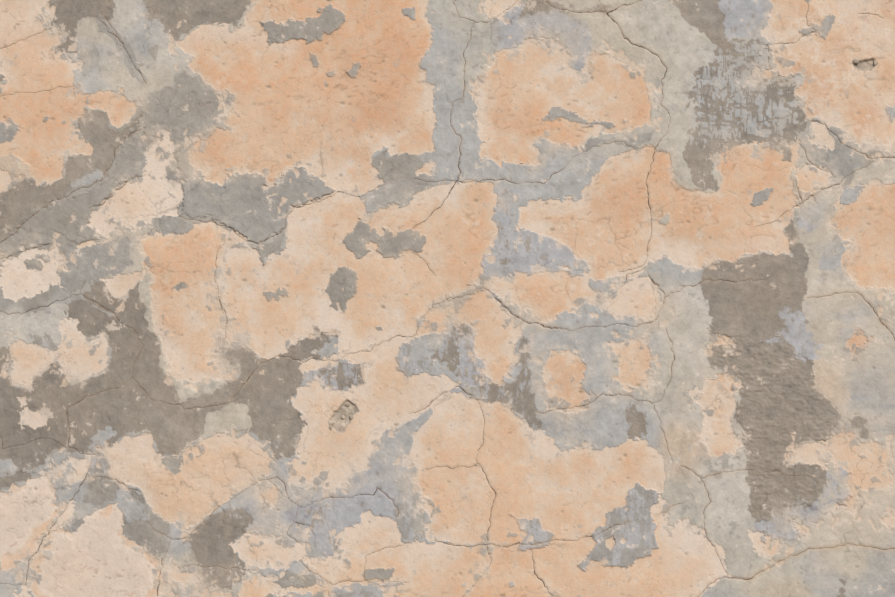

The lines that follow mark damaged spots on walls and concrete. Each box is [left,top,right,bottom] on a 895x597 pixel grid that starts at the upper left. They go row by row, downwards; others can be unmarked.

crack [5,519,57,586]
crack [0,388,136,502]
crack [0,128,145,259]
peeling [0,0,438,266]
crack [146,478,402,596]
crack [178,187,377,338]
peeling [0,134,732,597]
crack [356,0,895,597]
peeling [470,17,804,324]
peeling [667,0,895,193]
peeling [682,220,895,559]
peeling [796,120,895,292]